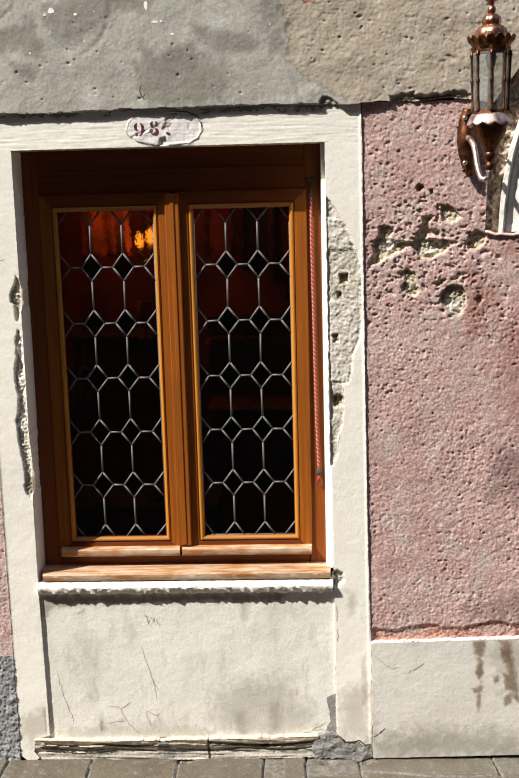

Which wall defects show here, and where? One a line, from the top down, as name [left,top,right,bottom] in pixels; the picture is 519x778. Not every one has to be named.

peeling [326,197,461,466]
spalling [436,271,485,316]
spalling [467,230,487,251]
peeling [10,277,35,498]
crack [44,647,162,754]